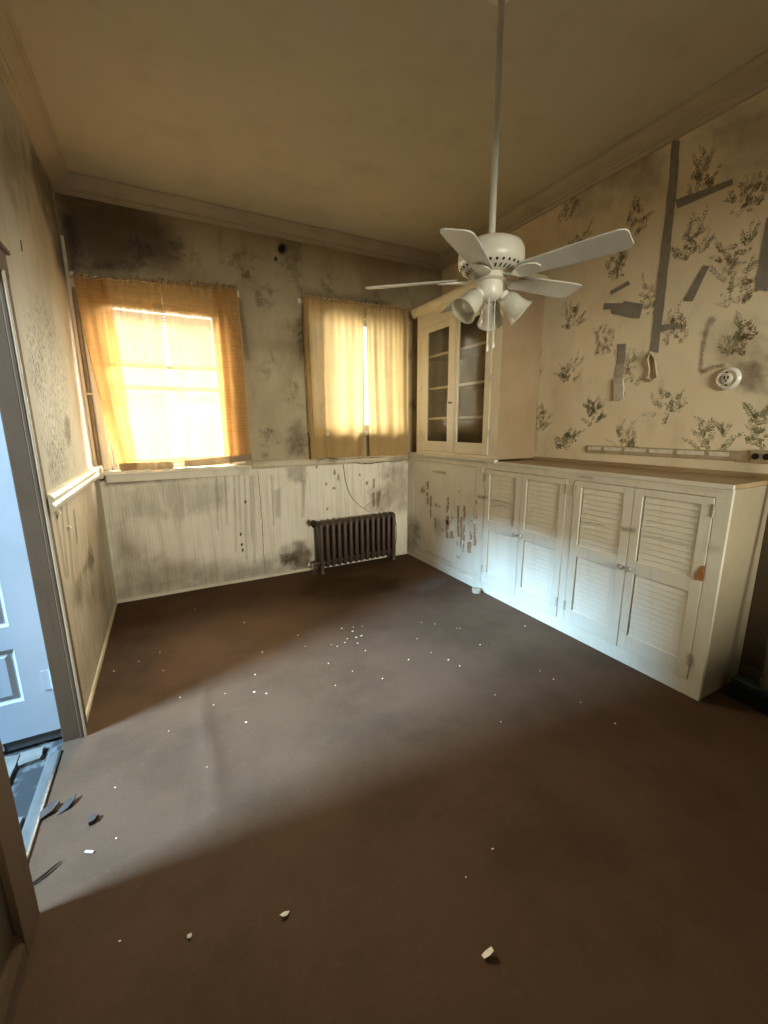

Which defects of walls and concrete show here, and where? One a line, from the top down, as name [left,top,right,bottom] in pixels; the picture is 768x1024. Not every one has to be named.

peeling [420,481,478,553]